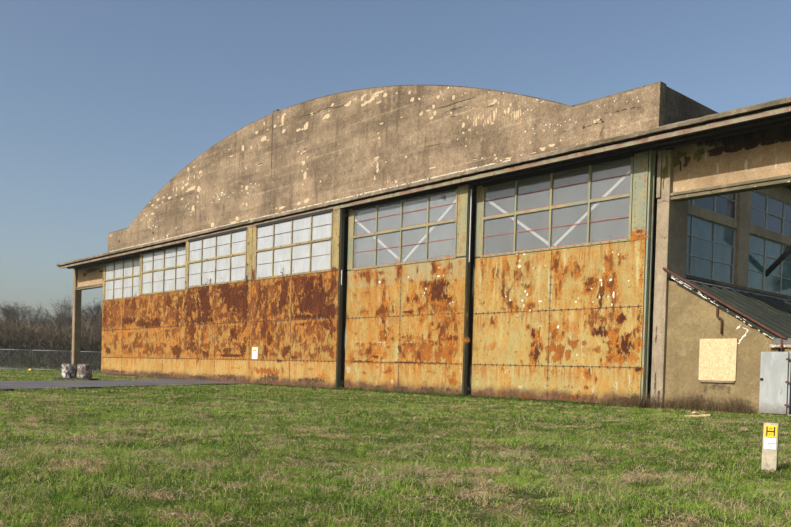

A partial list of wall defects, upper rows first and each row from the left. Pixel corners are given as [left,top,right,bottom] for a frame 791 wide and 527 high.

spalling [344,90,420,106]
peeling [457,99,521,160]
spalling [140,166,202,221]
rust [624,229,648,242]
rust [100,260,470,392]
rust [481,253,535,318]
rust [521,245,644,373]
rust [552,369,606,402]